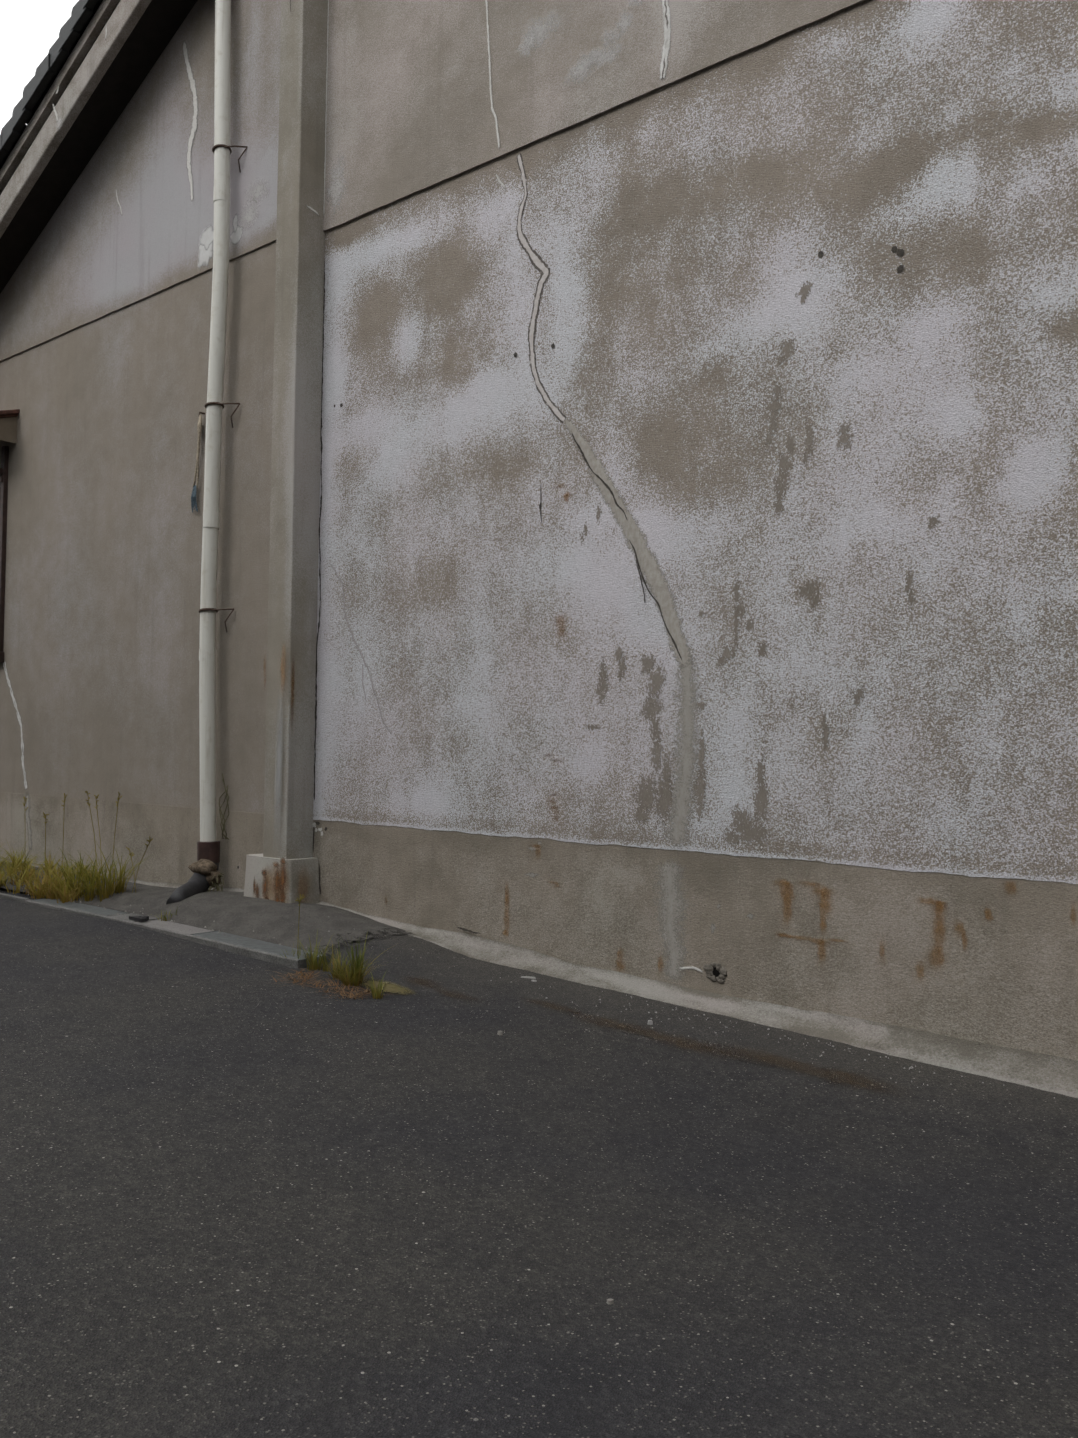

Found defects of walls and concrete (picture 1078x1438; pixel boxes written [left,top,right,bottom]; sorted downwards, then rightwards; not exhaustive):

crack [183,42,198,201]
crack [485,0,699,979]
crack [3,662,32,849]